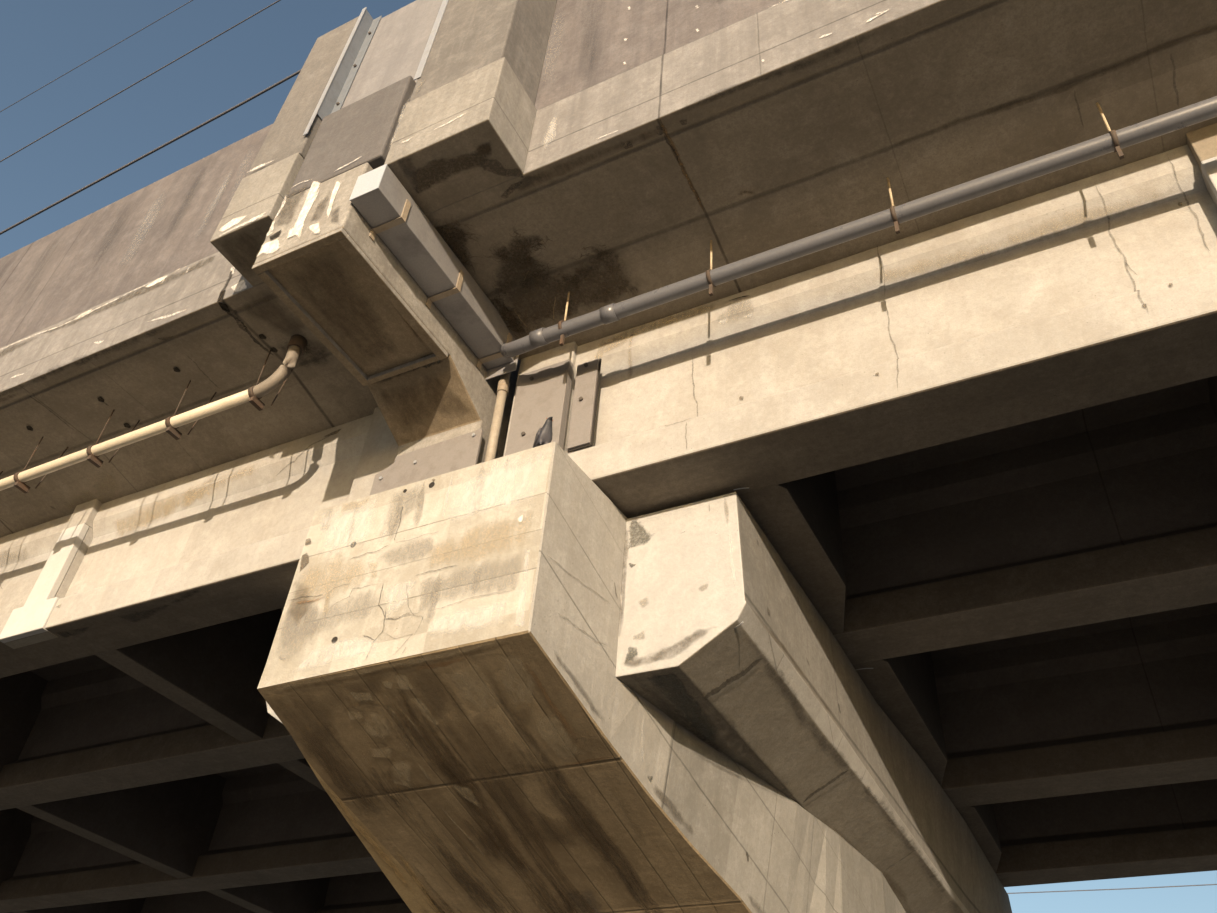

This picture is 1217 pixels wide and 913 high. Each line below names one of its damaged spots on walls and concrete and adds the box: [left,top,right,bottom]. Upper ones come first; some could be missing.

crack [363,586,409,655]